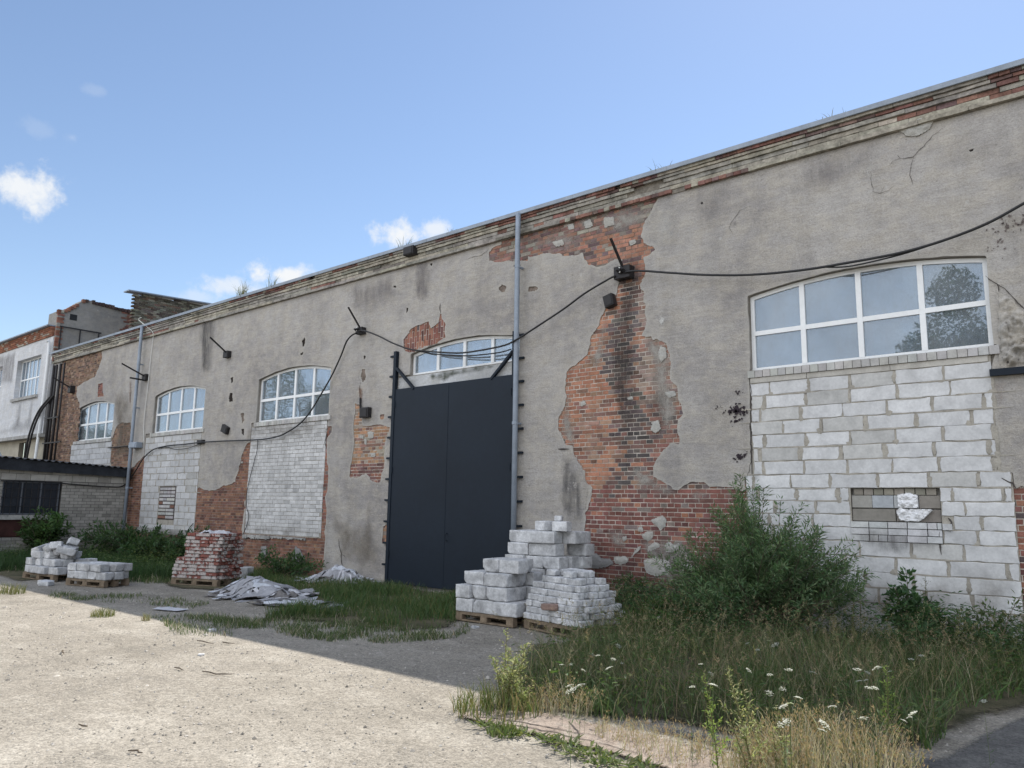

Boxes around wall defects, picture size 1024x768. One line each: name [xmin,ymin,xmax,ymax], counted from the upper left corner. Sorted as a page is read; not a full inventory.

crack [871,129,941,193]
flaking render [48,312,104,462]
flaking render [110,413,332,576]
flaking render [350,404,390,483]
flaking render [404,314,445,353]
flaking render [489,199,748,603]